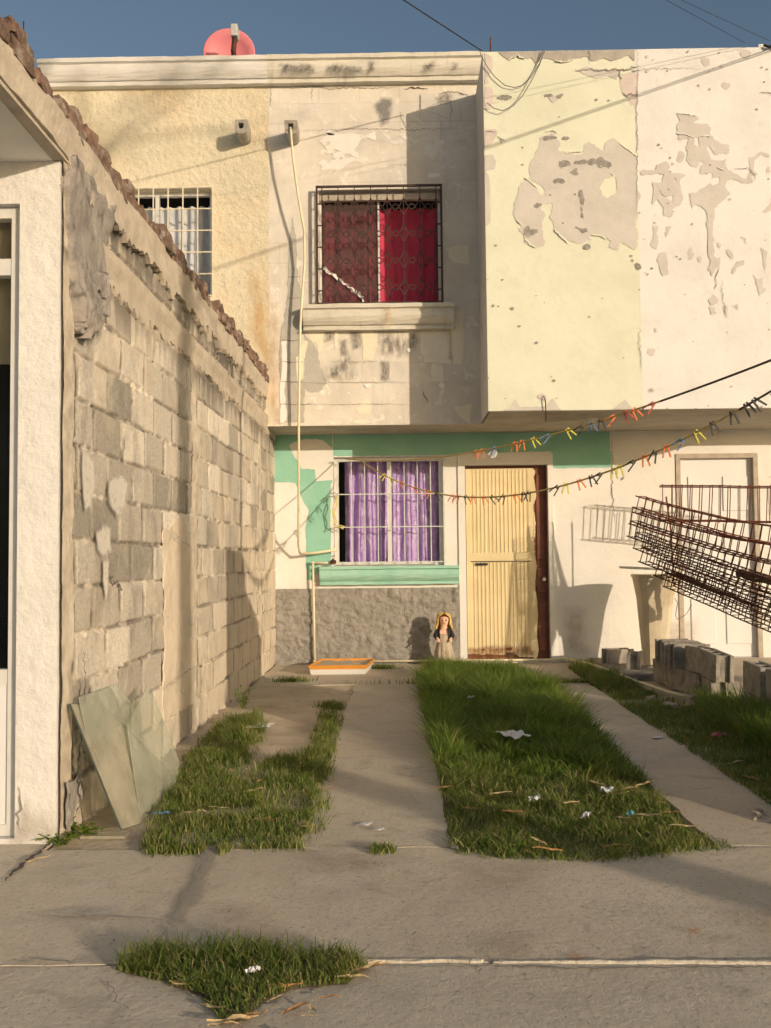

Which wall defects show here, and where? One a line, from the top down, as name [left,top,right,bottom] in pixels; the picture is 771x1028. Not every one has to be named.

water stain [377,99,391,123]
peeling [319,130,376,174]
peeling [485,129,498,226]
peeling [513,111,771,276]
peeling [741,236,768,304]
crack [15,787,23,831]
crack [5,843,51,881]